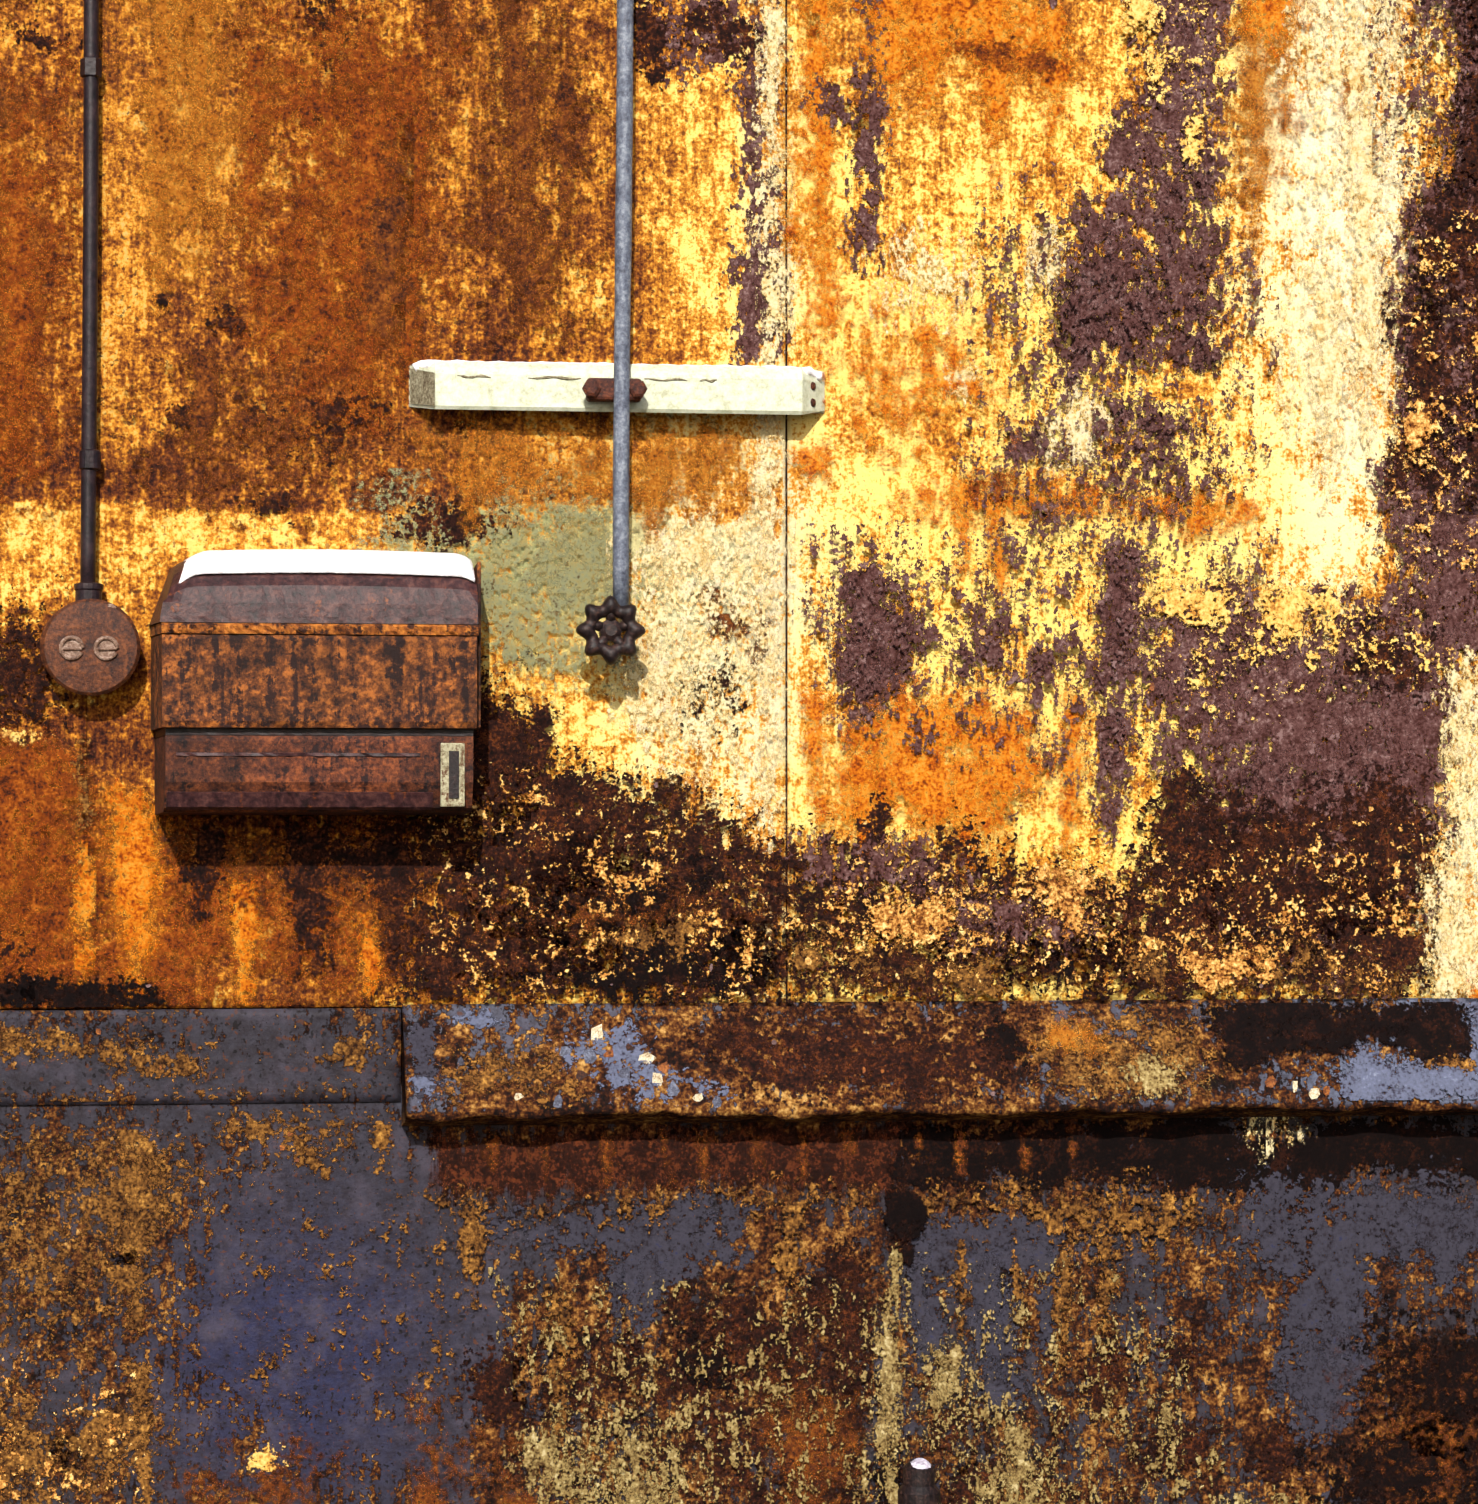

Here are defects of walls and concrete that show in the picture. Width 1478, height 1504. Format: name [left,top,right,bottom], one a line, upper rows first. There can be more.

corrosion [0,0,752,549]
corrosion [773,0,1262,596]
corrosion [1444,0,1478,199]